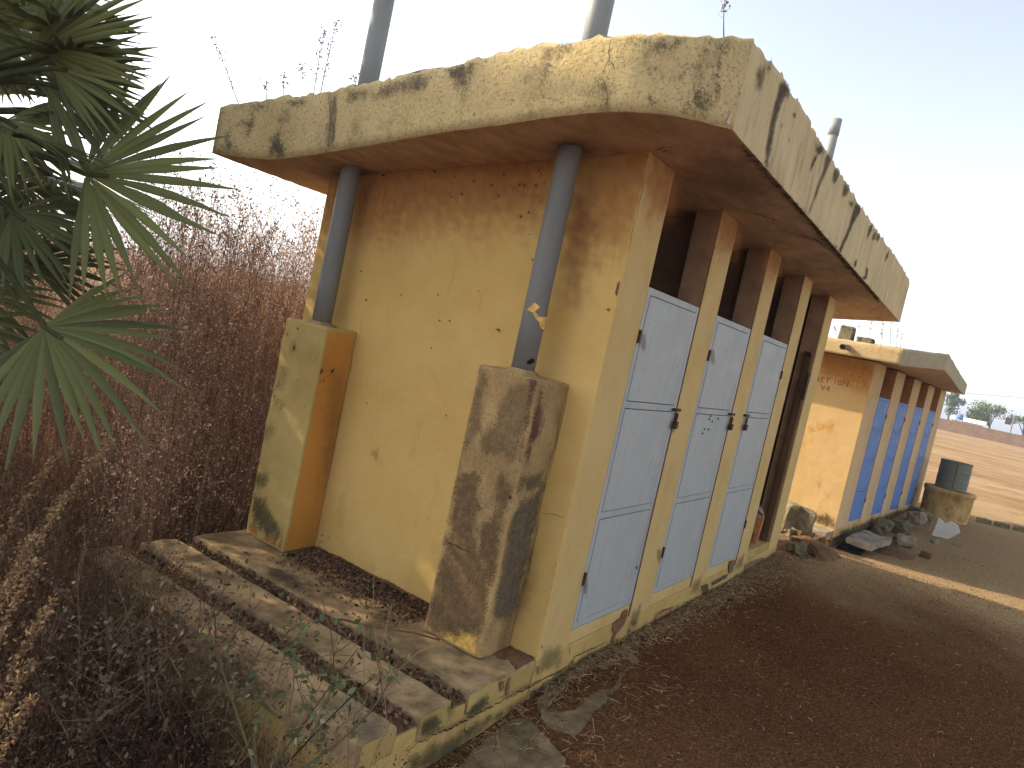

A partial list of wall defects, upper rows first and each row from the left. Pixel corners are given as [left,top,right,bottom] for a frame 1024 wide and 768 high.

damp [347,74,426,103]
damp [449,62,474,98]
crack [603,36,615,110]
damp [687,62,721,114]
damp [741,80,879,301]
damp [251,473,282,540]
damp [494,474,544,621]